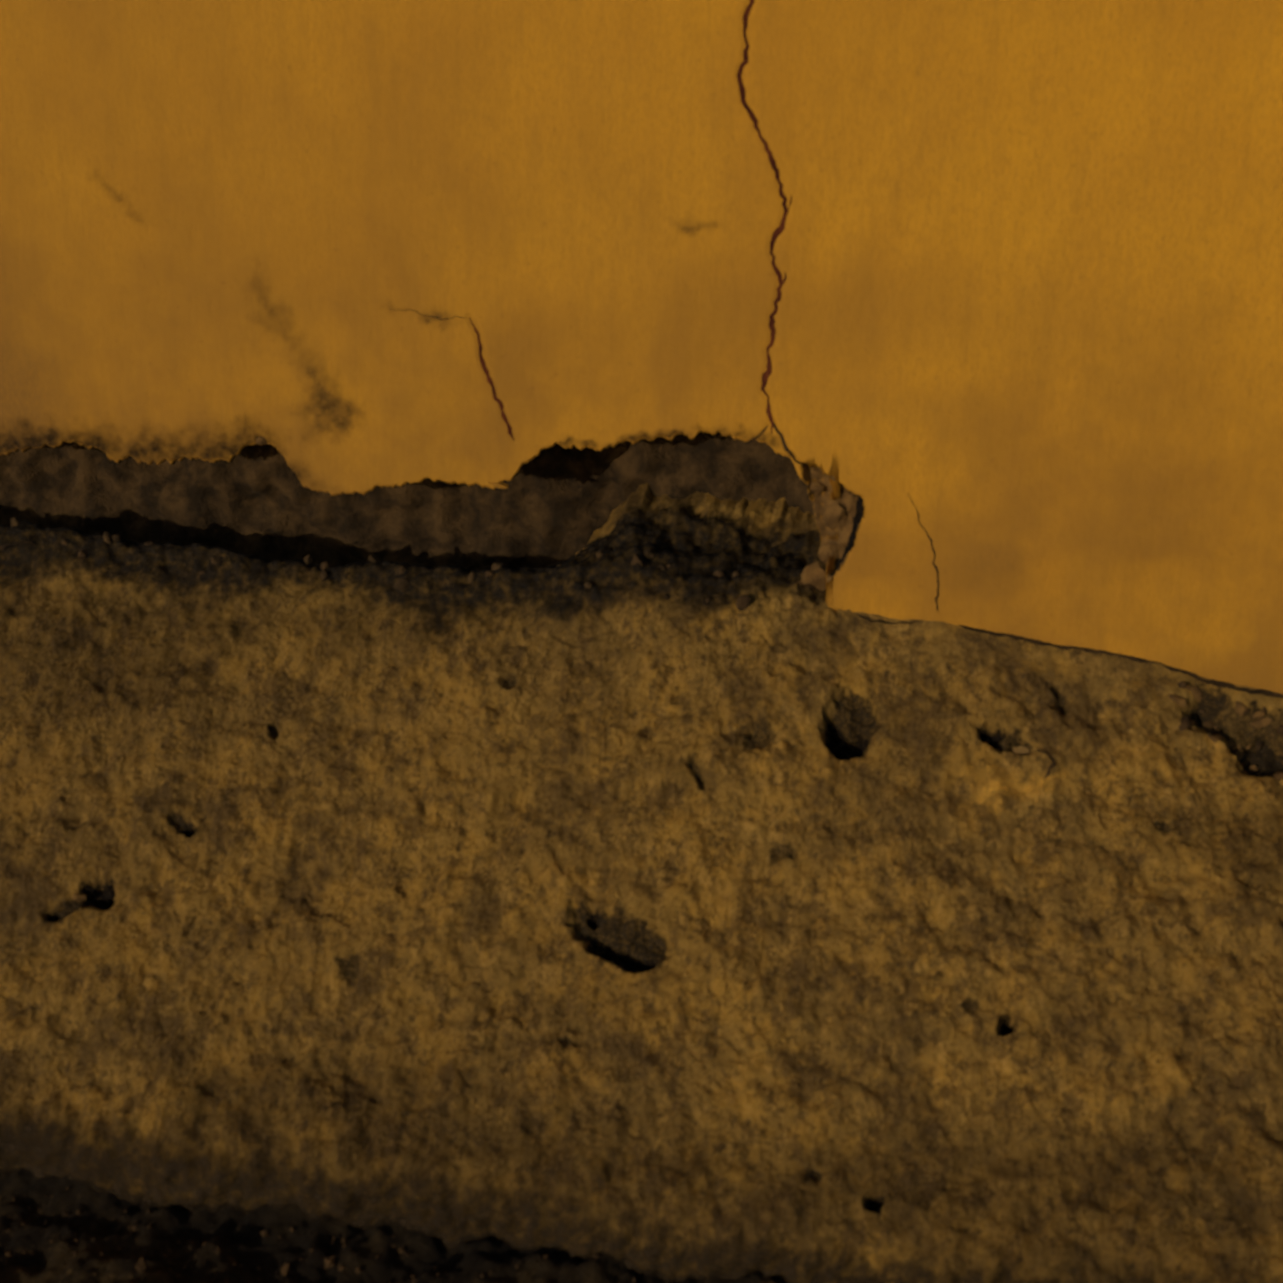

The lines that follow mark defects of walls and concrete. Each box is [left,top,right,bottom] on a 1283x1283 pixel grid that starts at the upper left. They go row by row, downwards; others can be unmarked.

crack [737,0,804,466]
crack [401,309,515,441]
spalling [0,431,864,593]
spalling [823,691,882,760]
spalling [979,725,1032,755]
spalling [1168,682,1283,781]
spalling [46,878,115,922]
spalling [569,899,666,973]